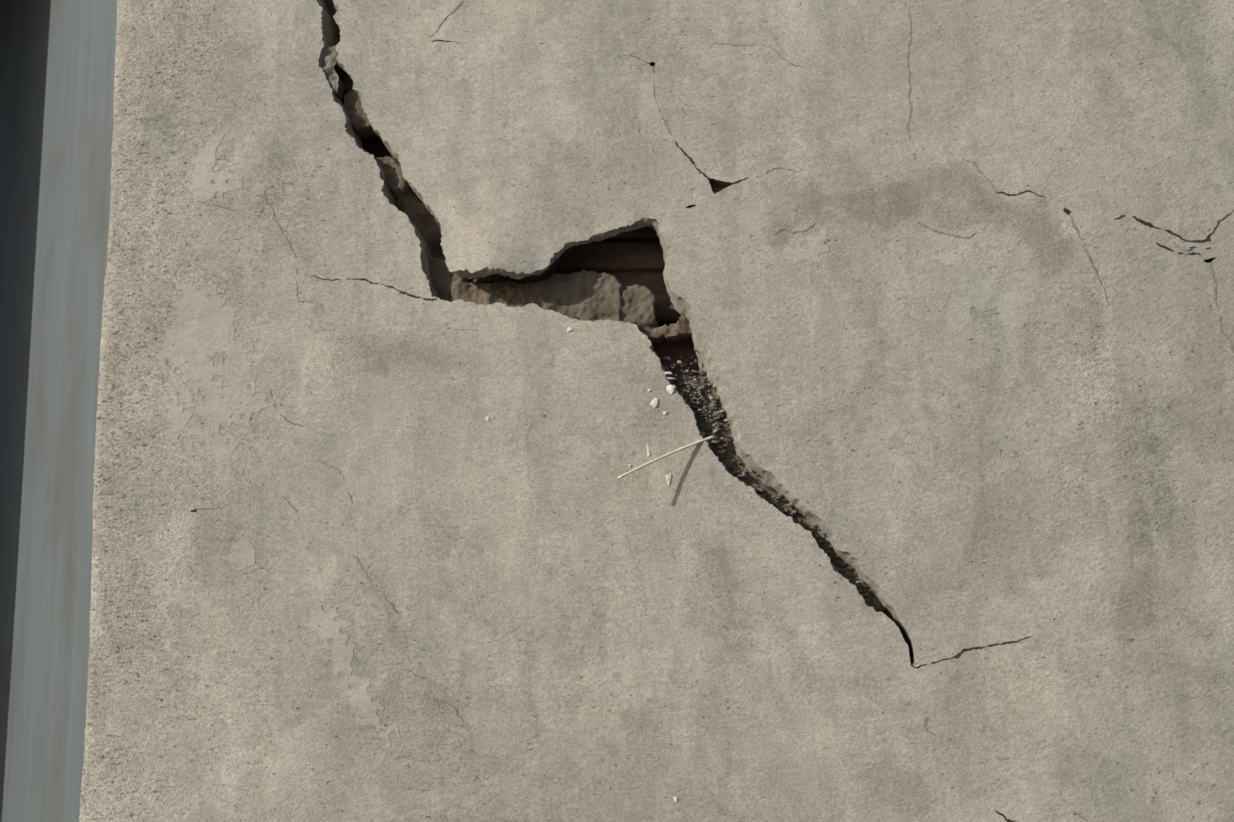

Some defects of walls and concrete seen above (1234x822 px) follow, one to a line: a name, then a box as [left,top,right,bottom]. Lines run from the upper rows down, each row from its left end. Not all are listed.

crack [264,0,1031,669]
crack [962,158,1107,300]
crack [1115,210,1234,353]